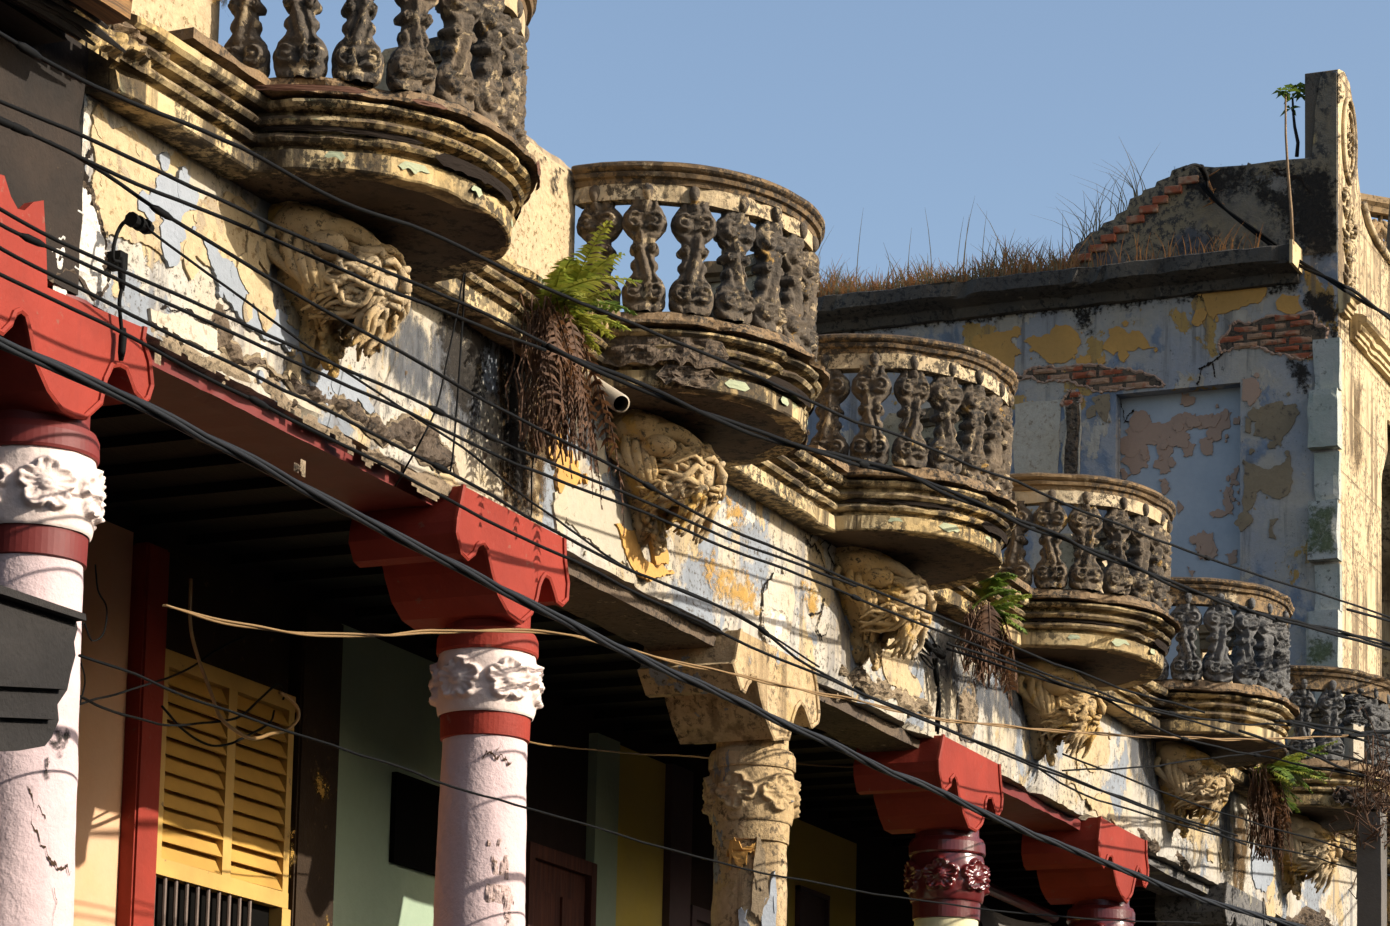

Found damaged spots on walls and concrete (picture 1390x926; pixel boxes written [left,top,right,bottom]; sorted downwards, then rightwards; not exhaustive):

damp [1173,135,1341,260]
peeling [47,104,459,501]
flaking render [1191,287,1329,361]
peeling [939,523,960,532]
peeling [971,320,1166,474]
peeling [1120,372,1300,577]
damp [1354,380,1363,486]
crack [27,786,70,926]